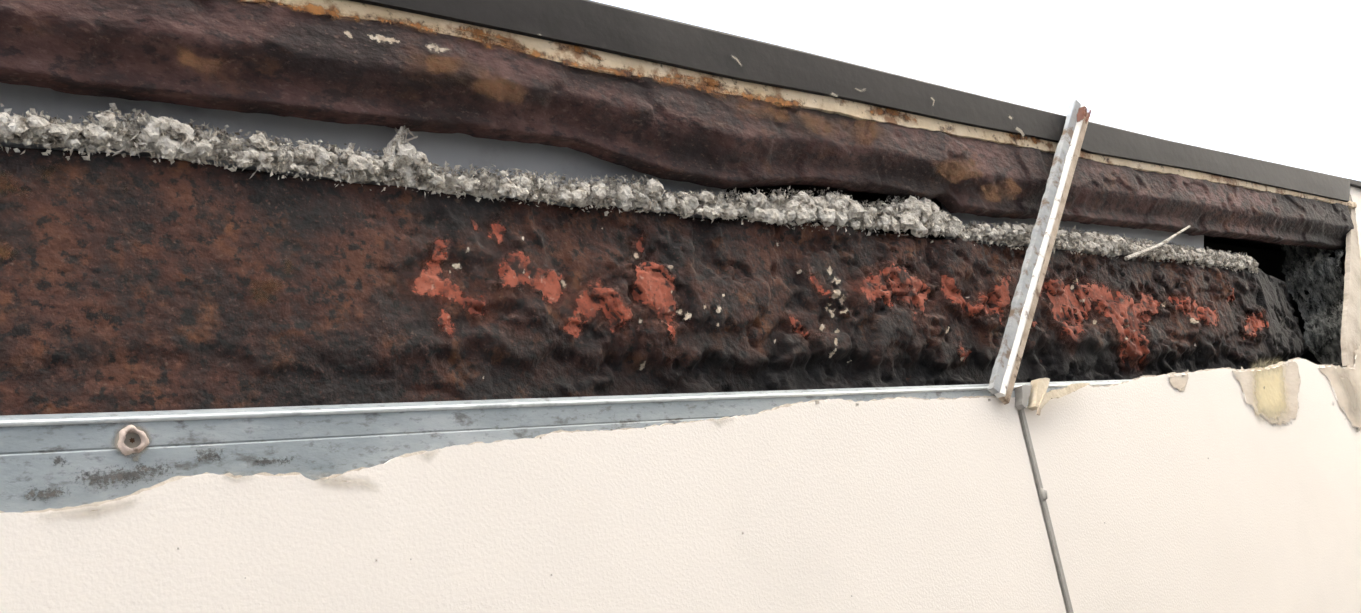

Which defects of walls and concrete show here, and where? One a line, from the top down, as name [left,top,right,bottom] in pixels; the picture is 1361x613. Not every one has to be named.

corrosion [239,0,917,145]
corrosion [1077,106,1092,124]
corrosion [1009,133,1053,147]
corrosion [937,158,1021,203]
peeling [1232,361,1301,425]
peeling [1319,343,1361,432]
corrosion [76,426,176,489]
corrosion [196,449,222,462]
corrosion [24,488,65,501]